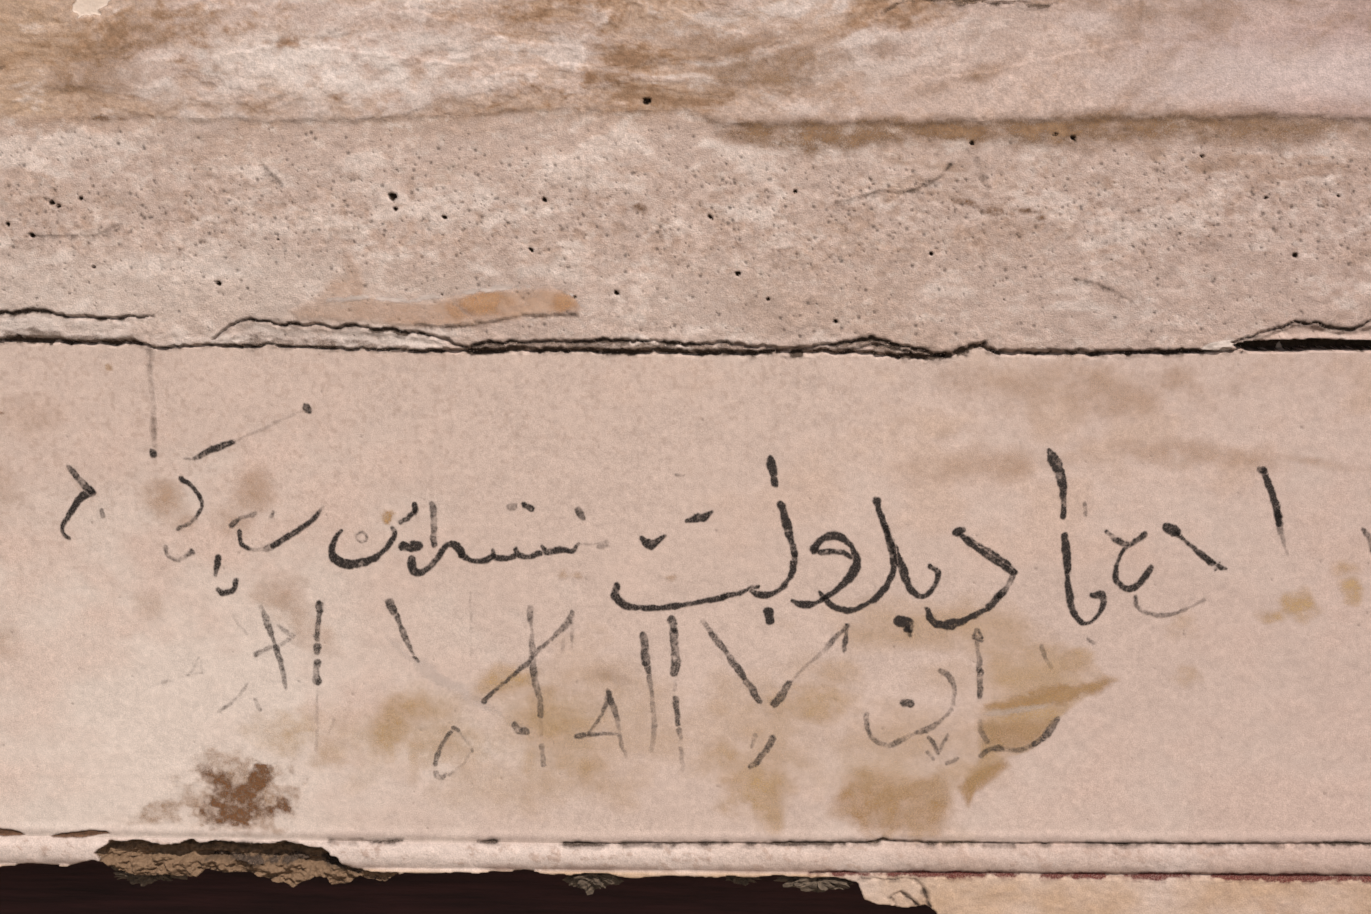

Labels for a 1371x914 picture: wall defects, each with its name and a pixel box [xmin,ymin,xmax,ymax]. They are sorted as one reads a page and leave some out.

flaking render [72,0,110,18]
crack [0,308,144,346]
crack [230,318,1371,361]
damp [963,665,1102,801]
damp [193,761,291,826]